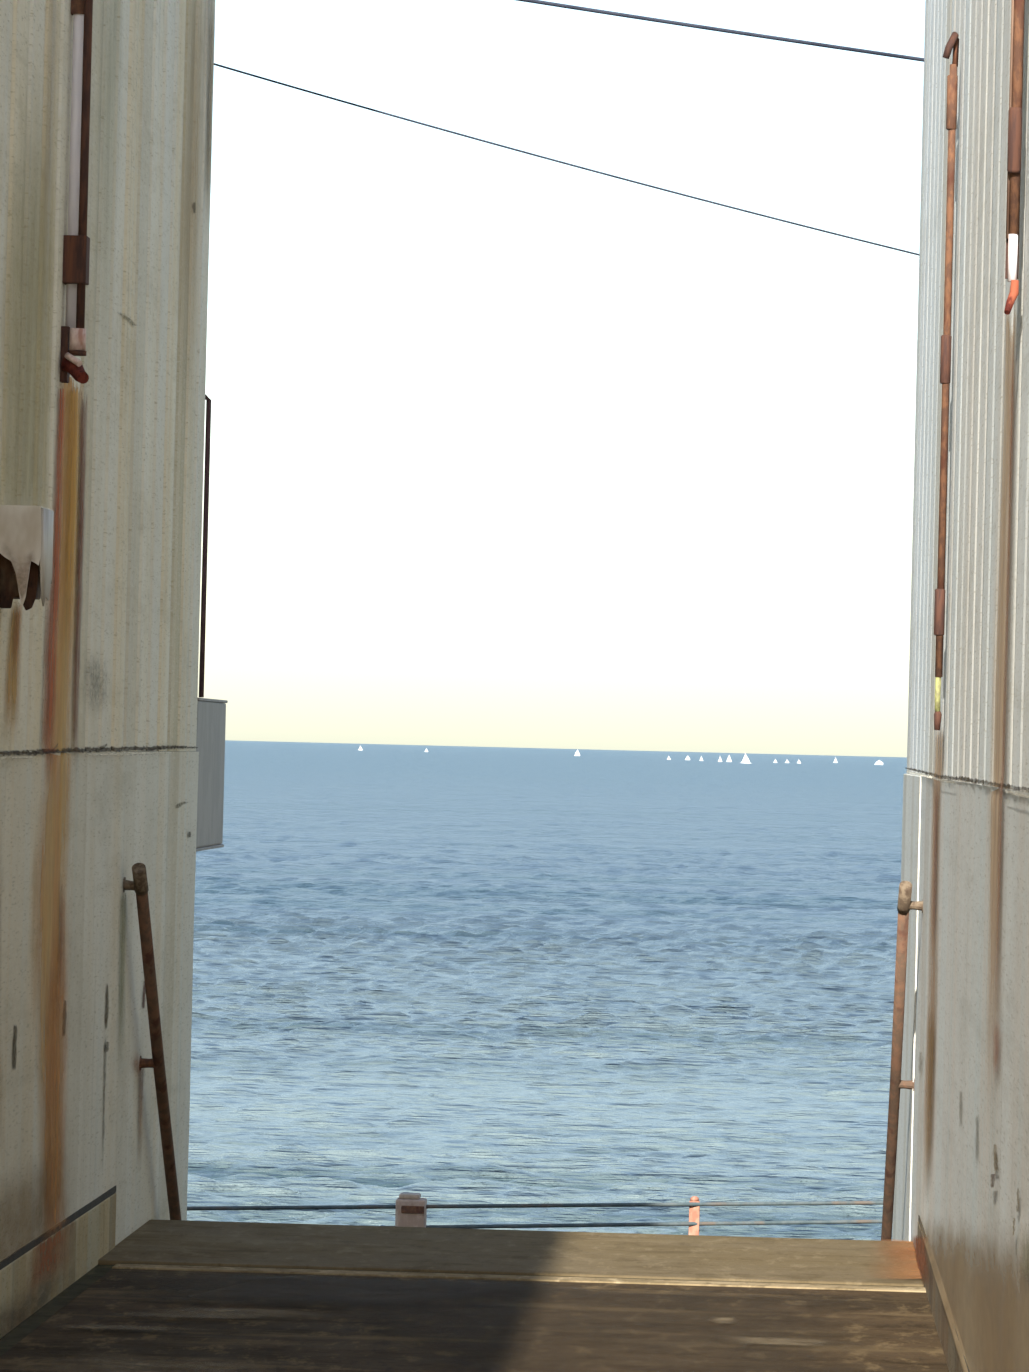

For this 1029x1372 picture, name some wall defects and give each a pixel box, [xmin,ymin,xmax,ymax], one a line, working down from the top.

rust [8,610,20,705]
rust [40,377,86,1224]
rust [991,315,1014,969]